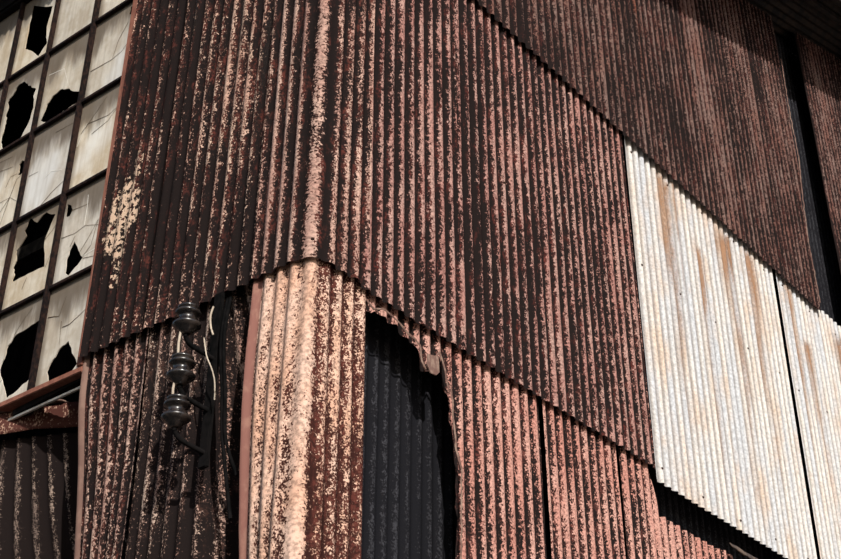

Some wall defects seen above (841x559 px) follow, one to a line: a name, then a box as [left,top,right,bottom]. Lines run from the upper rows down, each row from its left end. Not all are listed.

peeling [102,151,144,288]
rust [657,177,679,267]
rust [696,249,705,311]
rust [716,237,733,281]
rust [744,254,764,376]
rust [786,286,813,379]